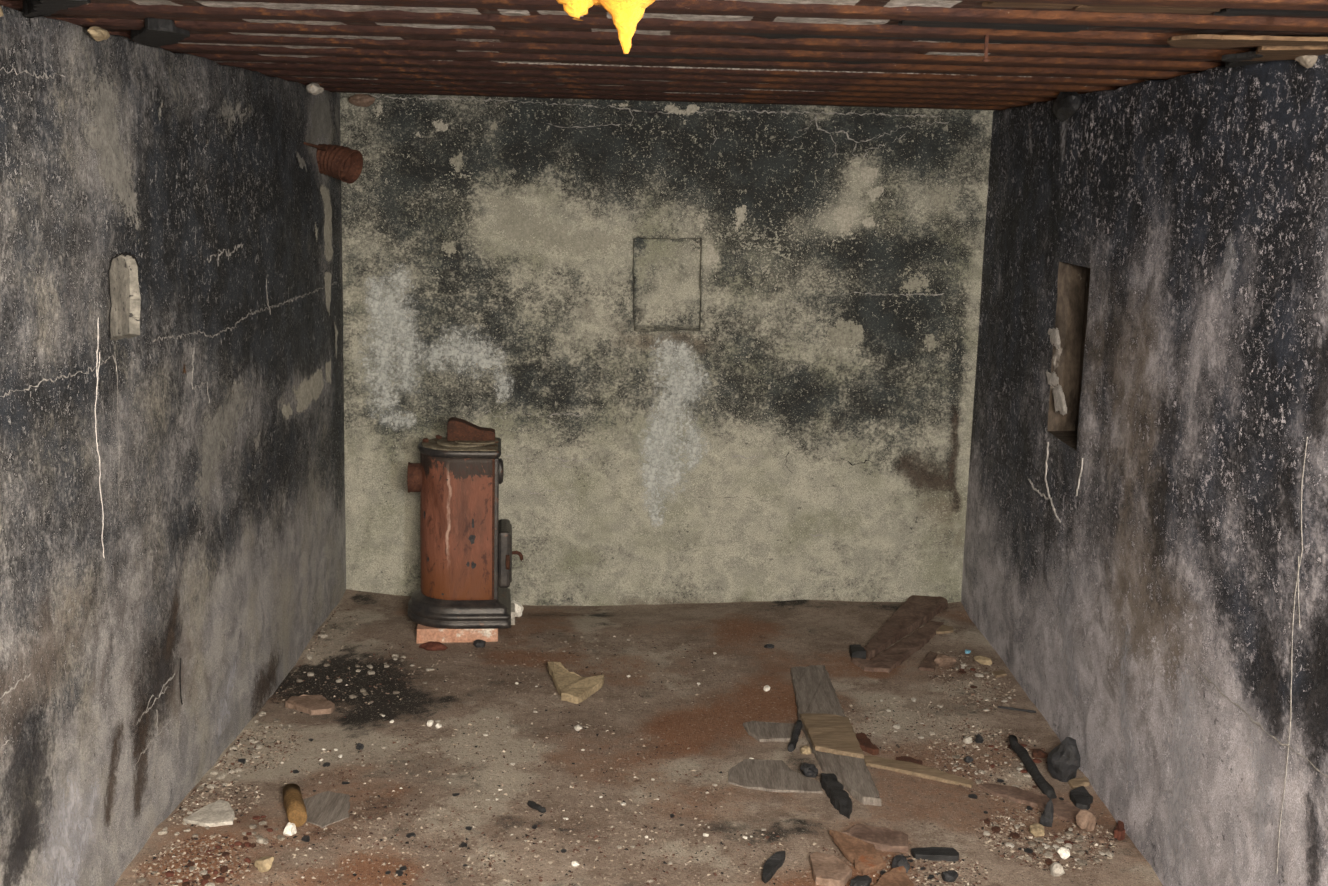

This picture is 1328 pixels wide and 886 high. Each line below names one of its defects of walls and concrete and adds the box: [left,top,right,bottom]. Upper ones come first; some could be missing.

crack [207,243,244,263]
crack [0,251,140,558]
crack [152,279,337,402]
water stain [363,270,511,426]
water stain [643,340,707,525]
water stain [895,411,960,512]
water stain [1028,442,1061,523]
crack [0,673,31,699]
water stain [1,593,180,886]
crack [134,658,183,770]
water stain [1257,620,1283,735]
water stain [1306,793,1323,886]